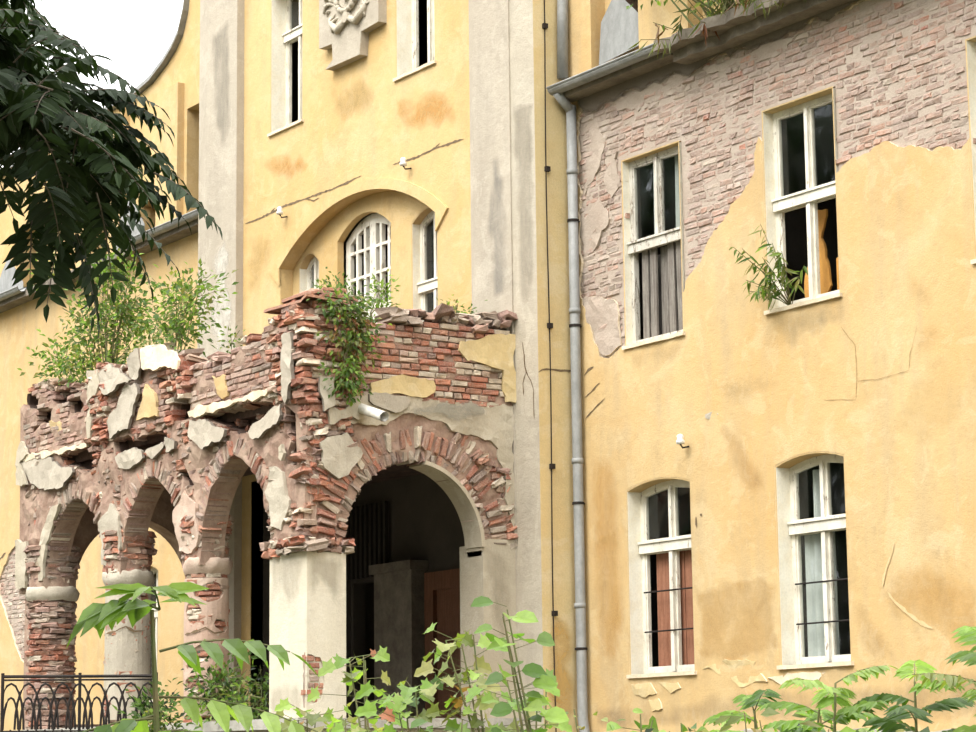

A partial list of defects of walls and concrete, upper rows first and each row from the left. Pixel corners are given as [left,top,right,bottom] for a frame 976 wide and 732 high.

flaking render [577,0,976,358]
peeling [15,344,181,491]
peeling [212,247,231,345]
peeling [181,332,297,530]
peeling [318,334,516,533]
crack [835,327,917,400]
flaking render [0,504,62,661]
peeling [98,503,122,566]
peeling [172,473,201,554]
peeling [702,659,825,687]